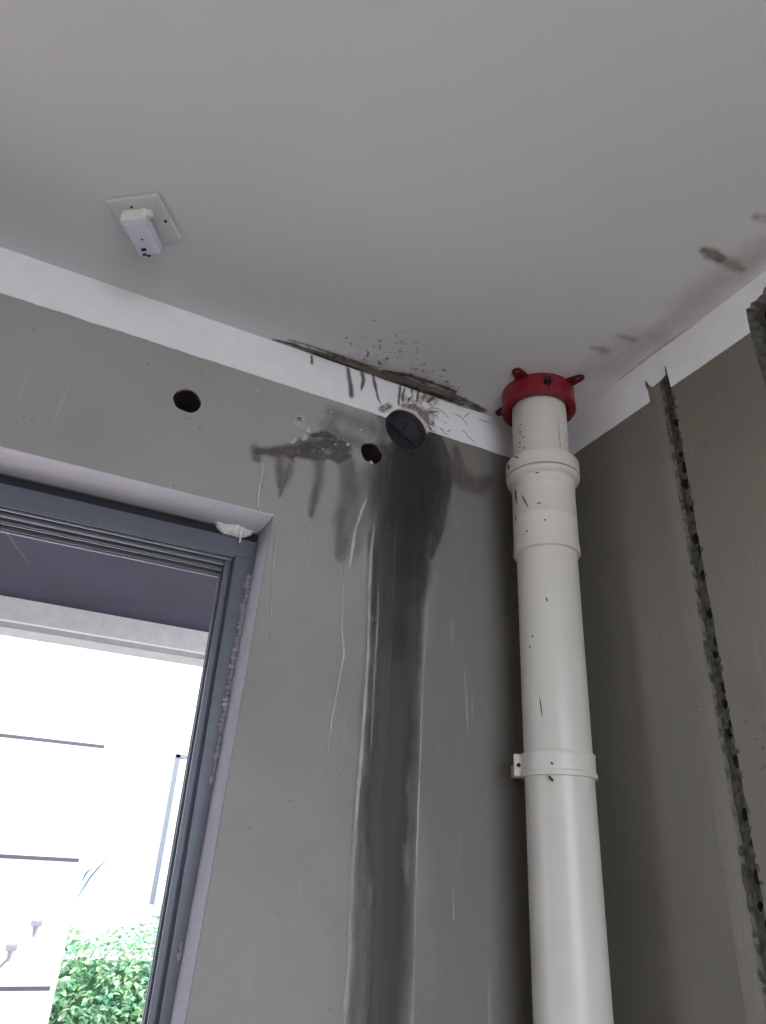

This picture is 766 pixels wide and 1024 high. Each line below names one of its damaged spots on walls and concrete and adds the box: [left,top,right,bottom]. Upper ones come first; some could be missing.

water stain [254,430,351,574]
water stain [273,339,490,1024]